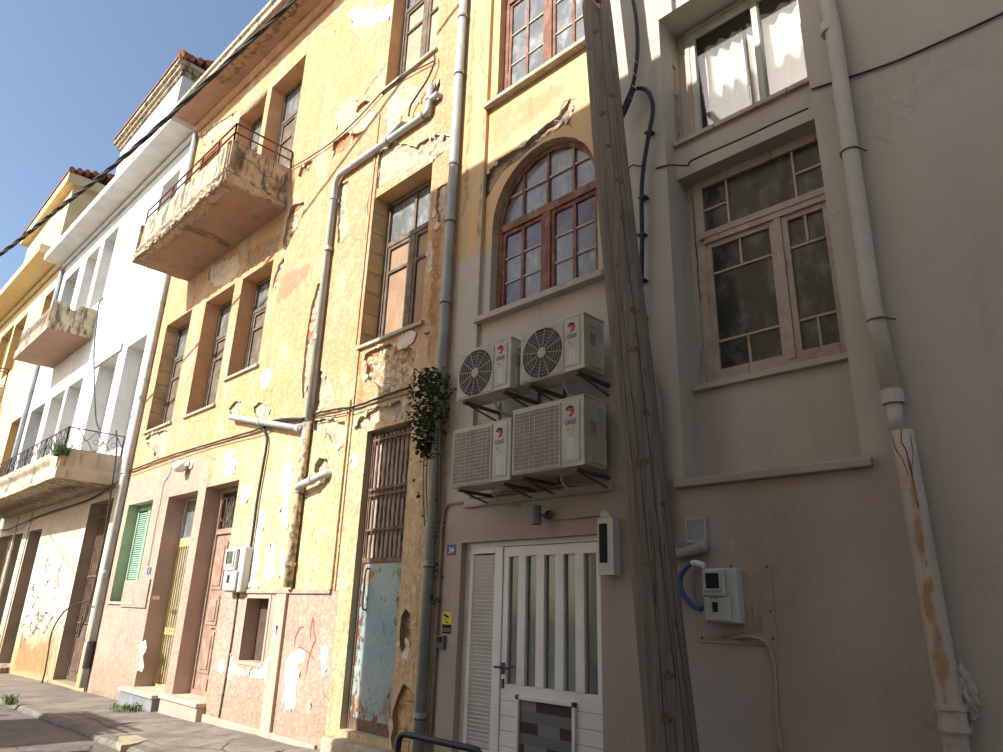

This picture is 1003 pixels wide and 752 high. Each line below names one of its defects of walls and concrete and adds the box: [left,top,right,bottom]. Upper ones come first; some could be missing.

peeling [346,0,393,27]
spalling [331,83,450,190]
spalling [485,98,575,200]
spalling [131,166,305,290]
spalling [302,282,417,485]
peeling [218,654,268,682]
peeling [281,648,306,712]
spalling [388,683,416,752]
spalling [397,608,412,665]
rust [924,579,947,681]